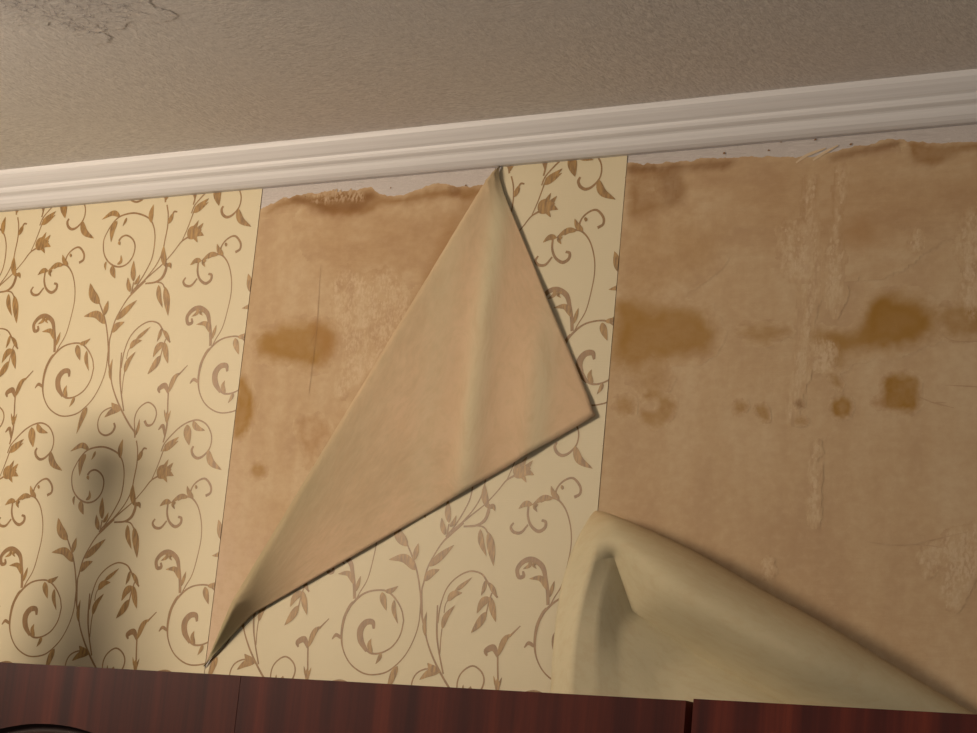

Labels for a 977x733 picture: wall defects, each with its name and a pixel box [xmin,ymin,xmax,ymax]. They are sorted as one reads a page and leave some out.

damp [232,372,260,444]
damp [249,314,341,377]
peeling [598,124,977,714]
damp [609,139,977,432]